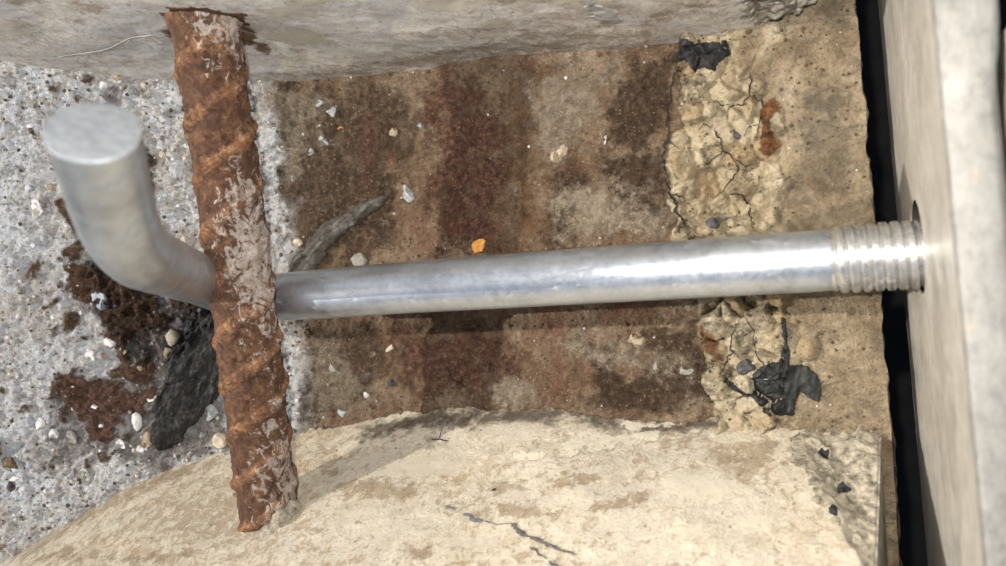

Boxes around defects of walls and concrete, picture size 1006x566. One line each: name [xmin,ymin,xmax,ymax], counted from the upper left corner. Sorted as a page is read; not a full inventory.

rust [159,5,271,55]
spalling [738,0,817,27]
crack [661,64,690,224]
crack [698,72,764,228]
rust [754,98,782,156]
spalling [471,239,485,254]
rust [41,197,173,475]
spalling [627,332,646,349]
crack [718,319,764,378]
crack [445,505,577,566]